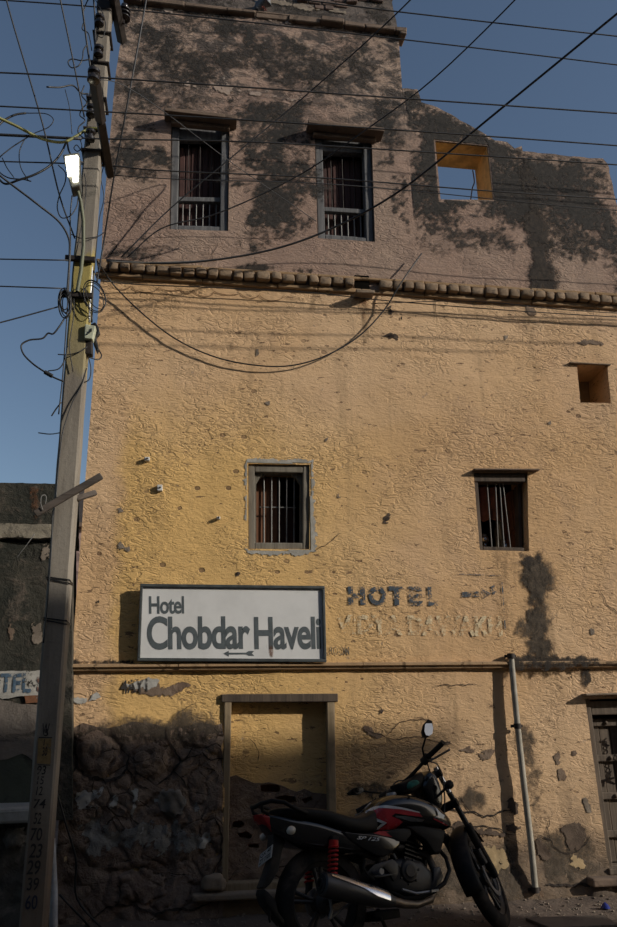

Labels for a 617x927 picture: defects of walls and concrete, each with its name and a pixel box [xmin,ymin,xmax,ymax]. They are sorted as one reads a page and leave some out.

damp [514,553,614,687]
spalling [56,708,327,925]
damp [543,833,598,884]